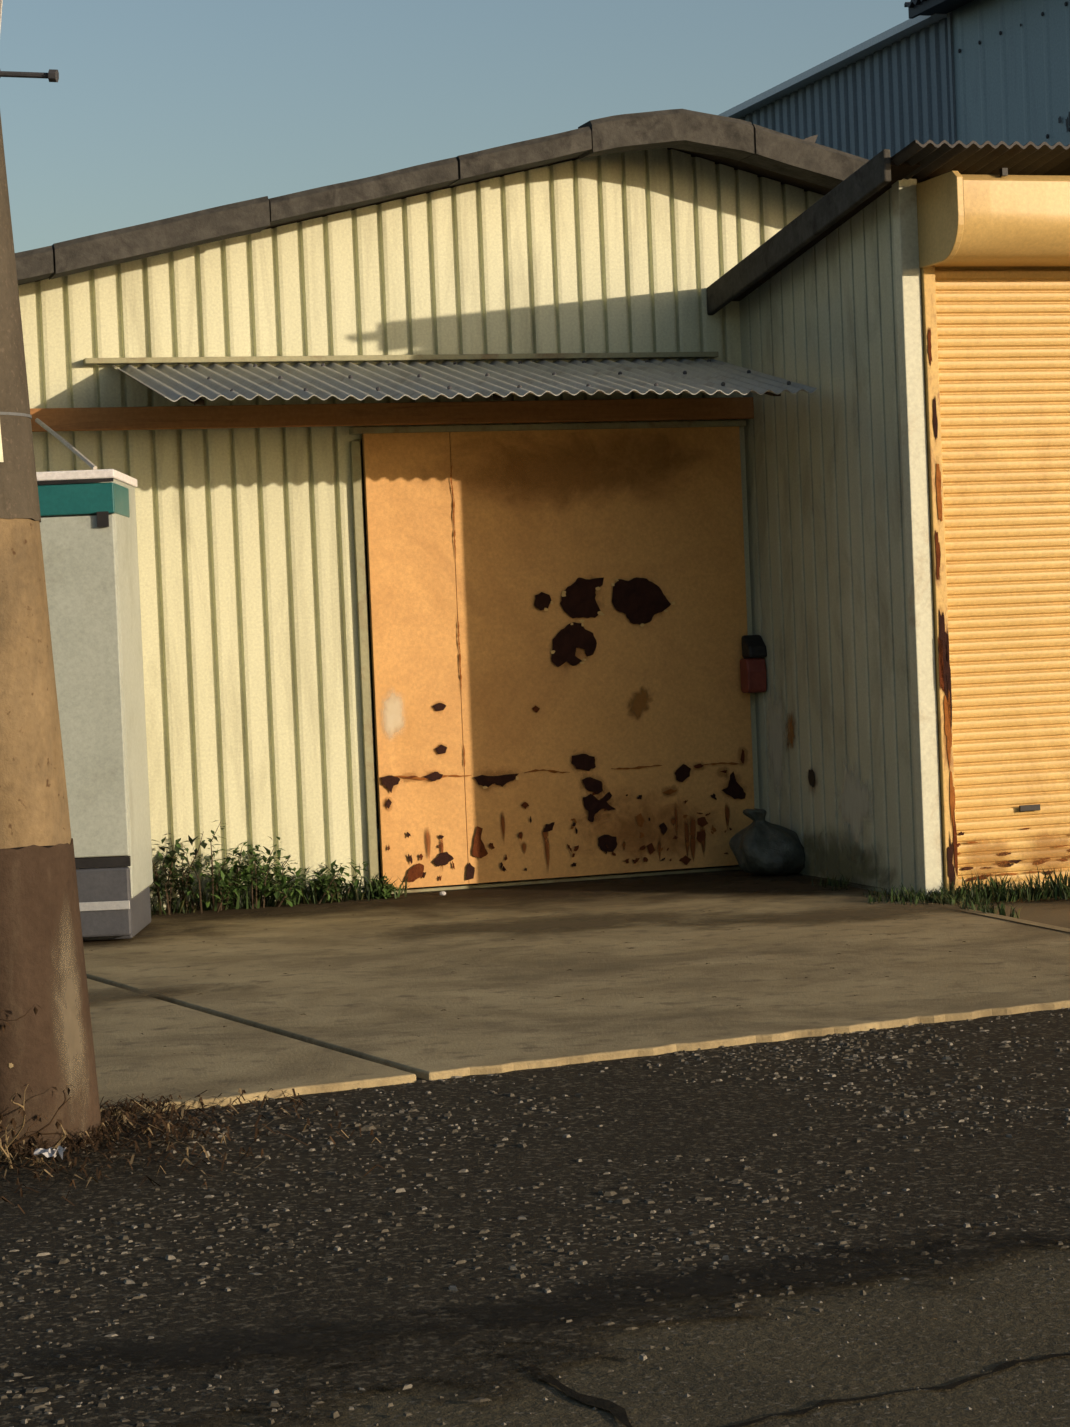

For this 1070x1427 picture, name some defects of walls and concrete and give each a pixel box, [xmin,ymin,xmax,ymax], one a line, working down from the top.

corrosion [380,748,746,882]
corrosion [938,610,1070,890]
crack [493,1353,632,1427]
crack [725,1353,1070,1427]